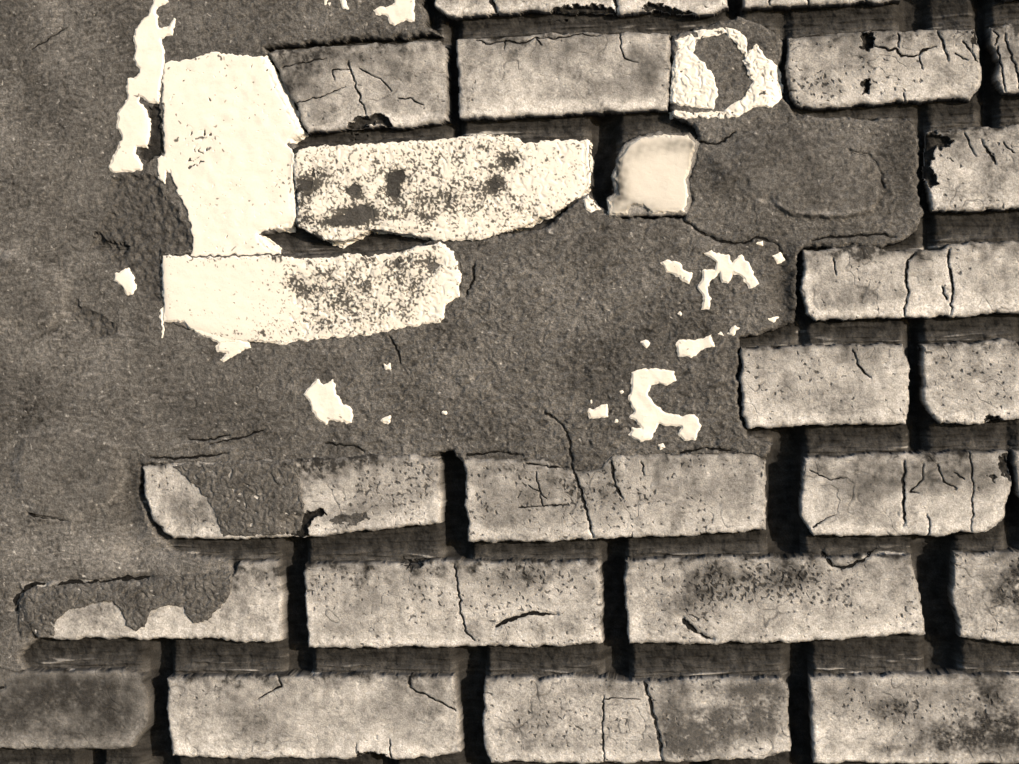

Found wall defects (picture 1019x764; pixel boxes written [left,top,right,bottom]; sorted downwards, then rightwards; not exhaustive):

crack [283,59,423,114]
peeling [642,1,784,120]
peeling [90,0,695,362]
spalling [917,131,954,210]
peeling [660,250,759,310]
peeling [676,325,740,358]
peeling [303,379,353,425]
peeling [588,368,701,450]
crack [466,411,593,536]
crack [680,446,736,454]
crack [901,451,974,535]
crack [601,681,663,762]